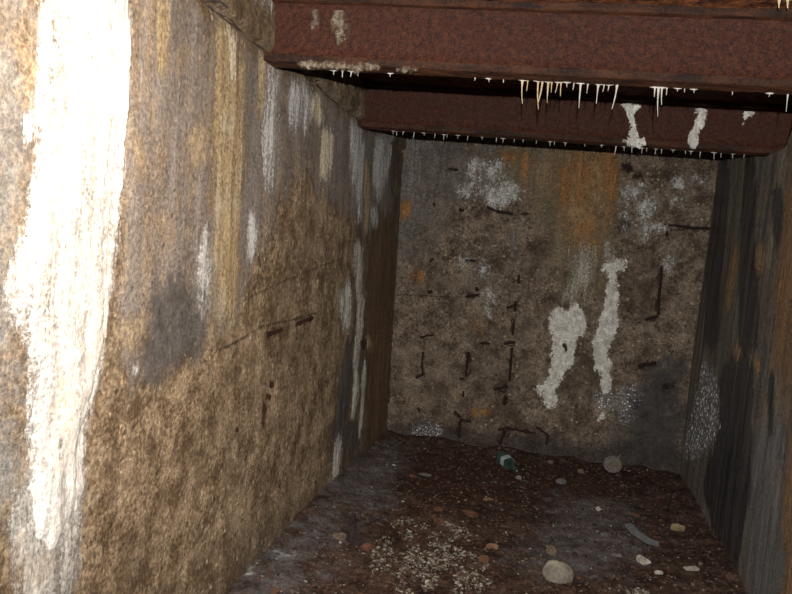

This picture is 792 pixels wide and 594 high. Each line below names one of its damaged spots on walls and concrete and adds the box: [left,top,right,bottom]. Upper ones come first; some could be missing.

efflorescence [456,158,525,210]
corrosion [500,144,621,262]
efflorescence [621,102,646,149]
efflorescence [688,108,708,149]
efflorescence [3,0,132,594]
damp [141,223,212,387]
crack [219,313,316,357]
damp [533,154,786,594]